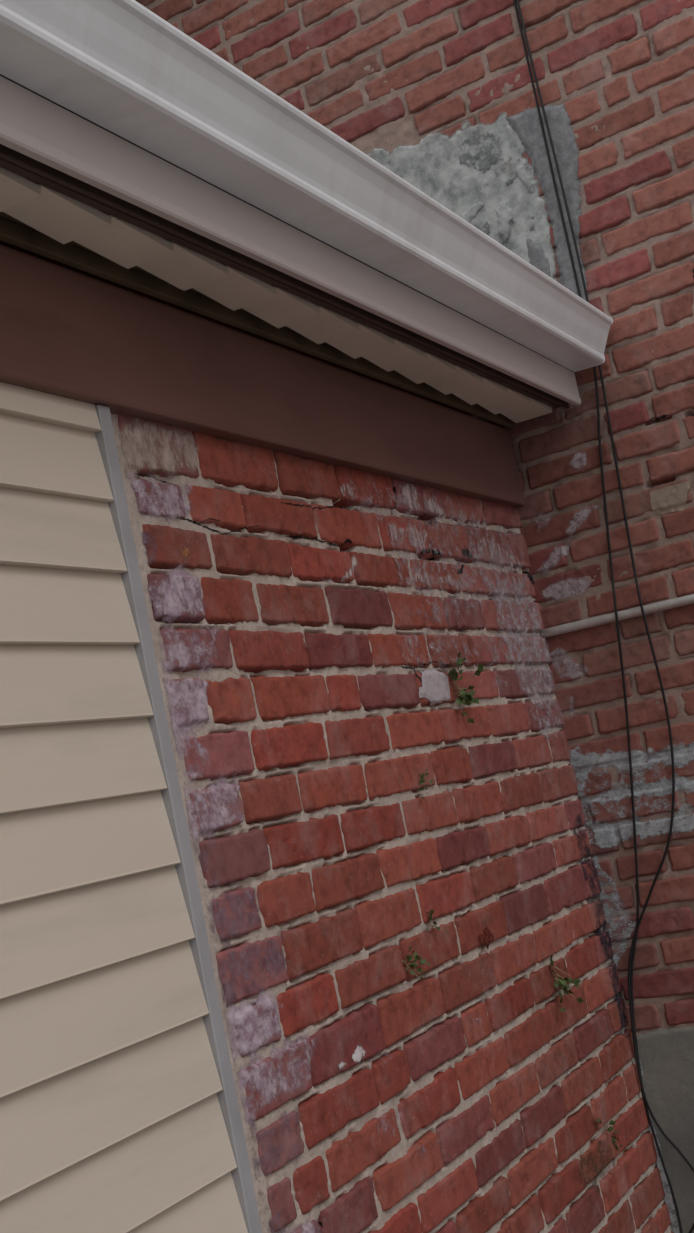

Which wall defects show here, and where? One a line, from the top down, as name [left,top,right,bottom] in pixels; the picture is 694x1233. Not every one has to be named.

peeling [367,112,556,281]
crack [178,516,259,535]
crack [280,502,339,546]
leakage [388,483,597,737]
leakage [569,742,694,966]
leakage [649,1105,679,1233]